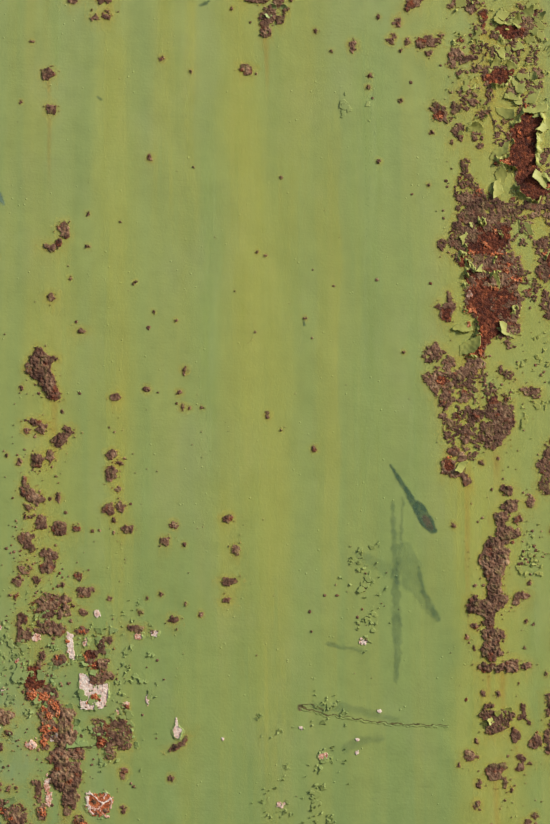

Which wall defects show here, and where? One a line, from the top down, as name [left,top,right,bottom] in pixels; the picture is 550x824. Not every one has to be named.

corrosion [245,0,293,38]
corrosion [385,0,445,59]
peeling [490,0,550,92]
corrosion [422,0,550,487]
corrosion [465,440,550,680]
peeling [42,773,53,807]
peeling [0,600,161,772]
peeling [83,790,114,820]
peeling [170,717,185,742]
corrosion [457,682,550,818]